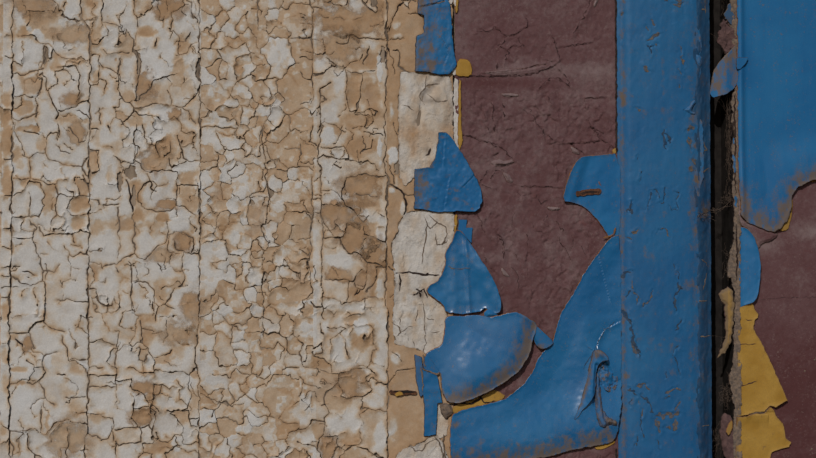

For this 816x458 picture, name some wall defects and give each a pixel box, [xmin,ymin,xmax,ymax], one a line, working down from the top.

crack [2,0,232,458]
crack [261,128,271,337]
peeling [0,0,639,458]
peeling [717,227,761,358]